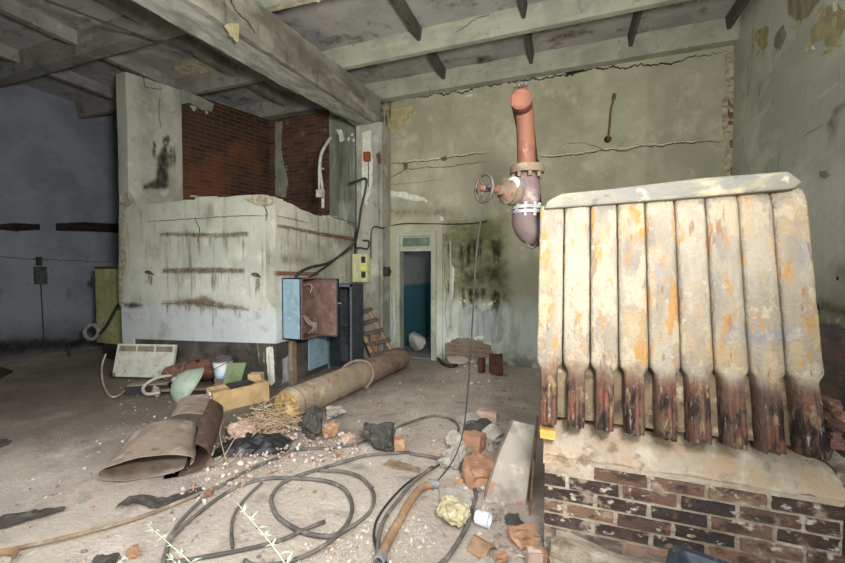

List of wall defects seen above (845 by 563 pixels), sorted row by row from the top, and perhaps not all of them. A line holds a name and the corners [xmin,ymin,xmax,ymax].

peeling [752,0,845,57]
crack [395,51,724,102]
spalling [722,50,735,176]
crack [537,140,721,158]
crack [391,152,488,184]
corrosion [167,297,246,310]
damp [462,270,498,304]